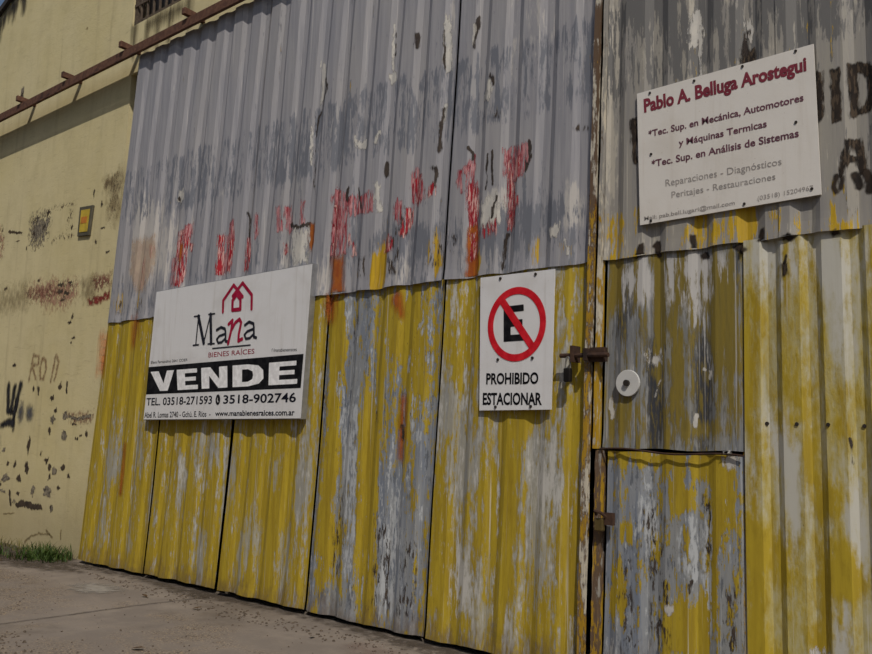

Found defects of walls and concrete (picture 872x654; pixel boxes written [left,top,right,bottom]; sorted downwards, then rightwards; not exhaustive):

peeling [687,10,705,76]
peeling [741,19,754,58]
peeling [437,103,447,153]
peeling [276,201,311,266]
peeling [330,161,439,274]
peeling [452,143,529,271]
peeling [549,220,569,255]
peeling [721,450,740,471]
peeling [373,524,417,620]
peeling [619,549,636,648]
peeling [643,504,674,650]
peeling [726,589,737,654]